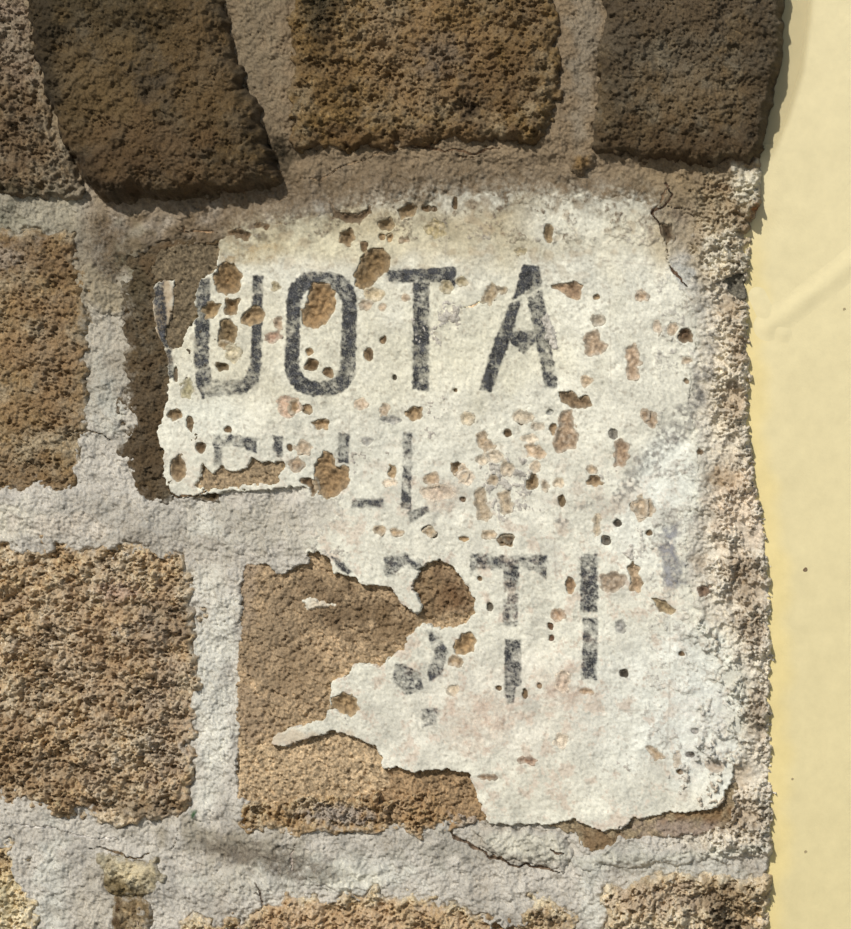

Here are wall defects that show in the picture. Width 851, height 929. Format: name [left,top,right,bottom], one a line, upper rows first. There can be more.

spalling [223,228,251,241]
crack [650,183,684,284]
spalling [151,242,283,372]
spalling [301,282,336,329]
spalling [303,355,334,378]
peeling [179,377,194,399]
spalling [167,408,183,421]
peeling [276,395,330,430]
spalling [170,453,187,482]
spalling [195,439,350,500]
spalling [236,551,498,825]
crack [451,831,564,873]